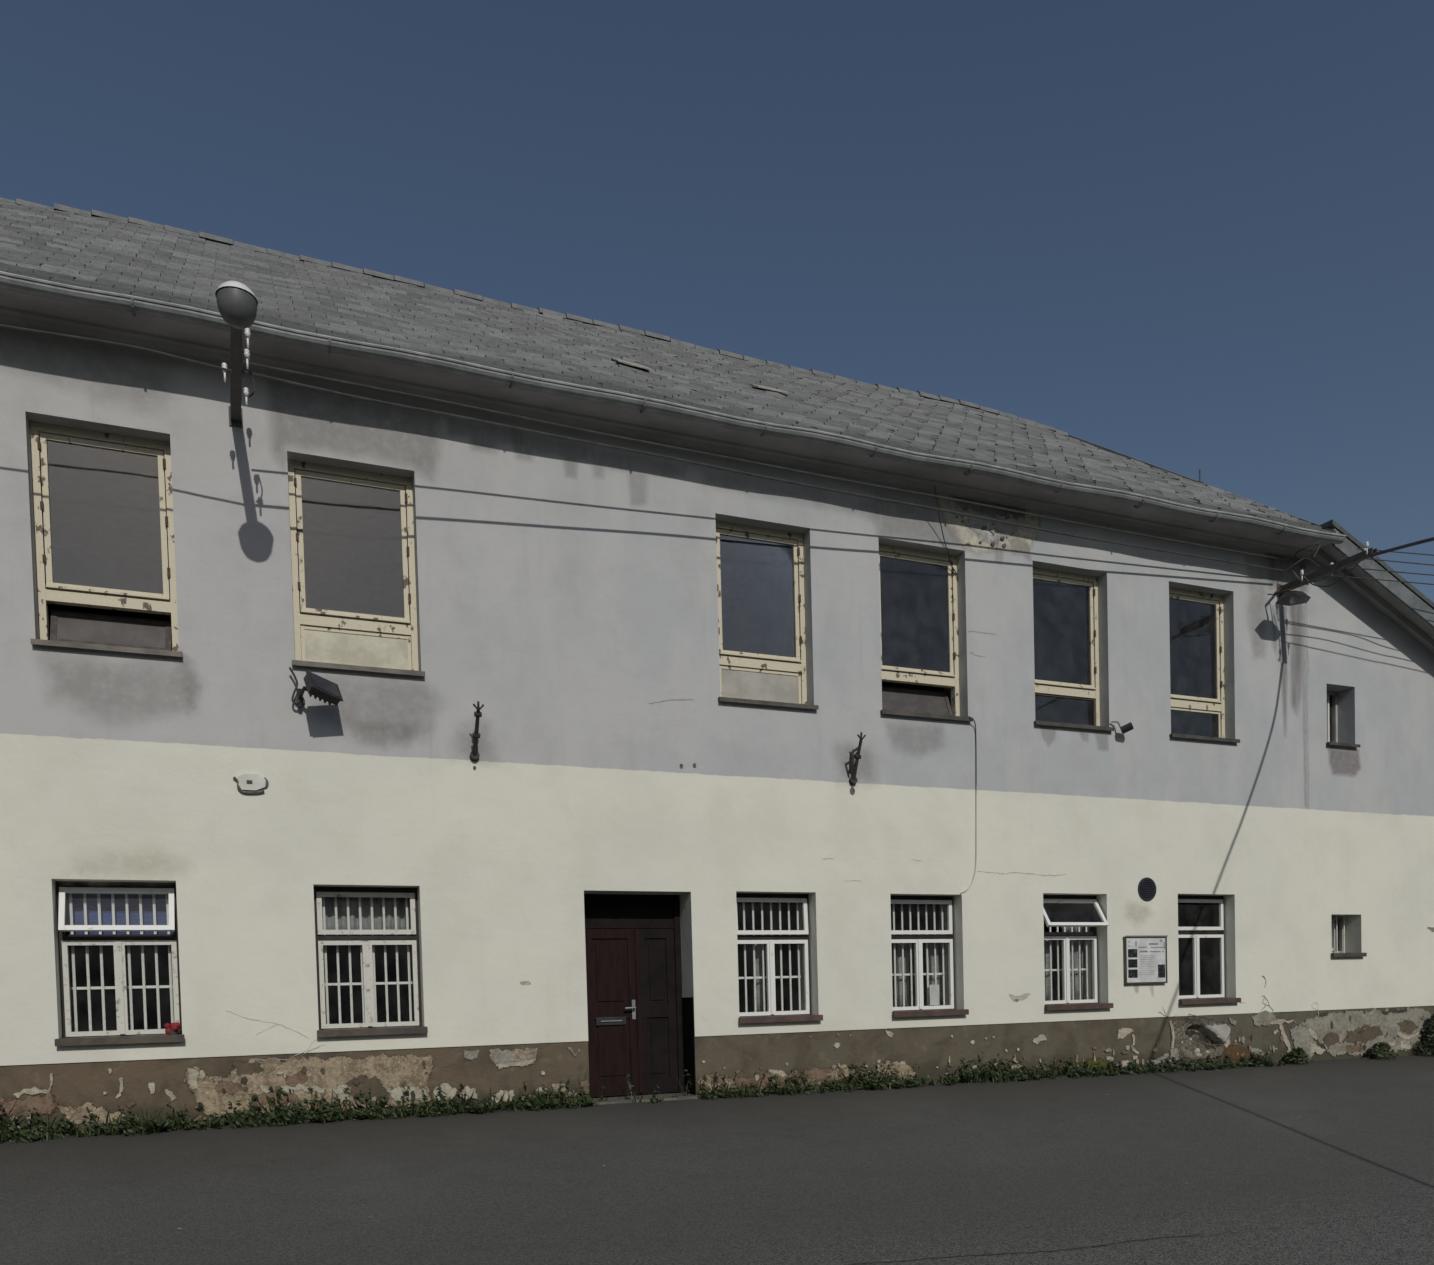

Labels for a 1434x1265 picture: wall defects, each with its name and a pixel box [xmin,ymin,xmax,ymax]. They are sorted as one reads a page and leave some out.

flaking render [936,493,1040,553]
peeling [970,1034,1056,1071]
peeling [1075,1007,1431,1068]
peeling [0,1068,140,1132]
peeling [148,1047,590,1121]